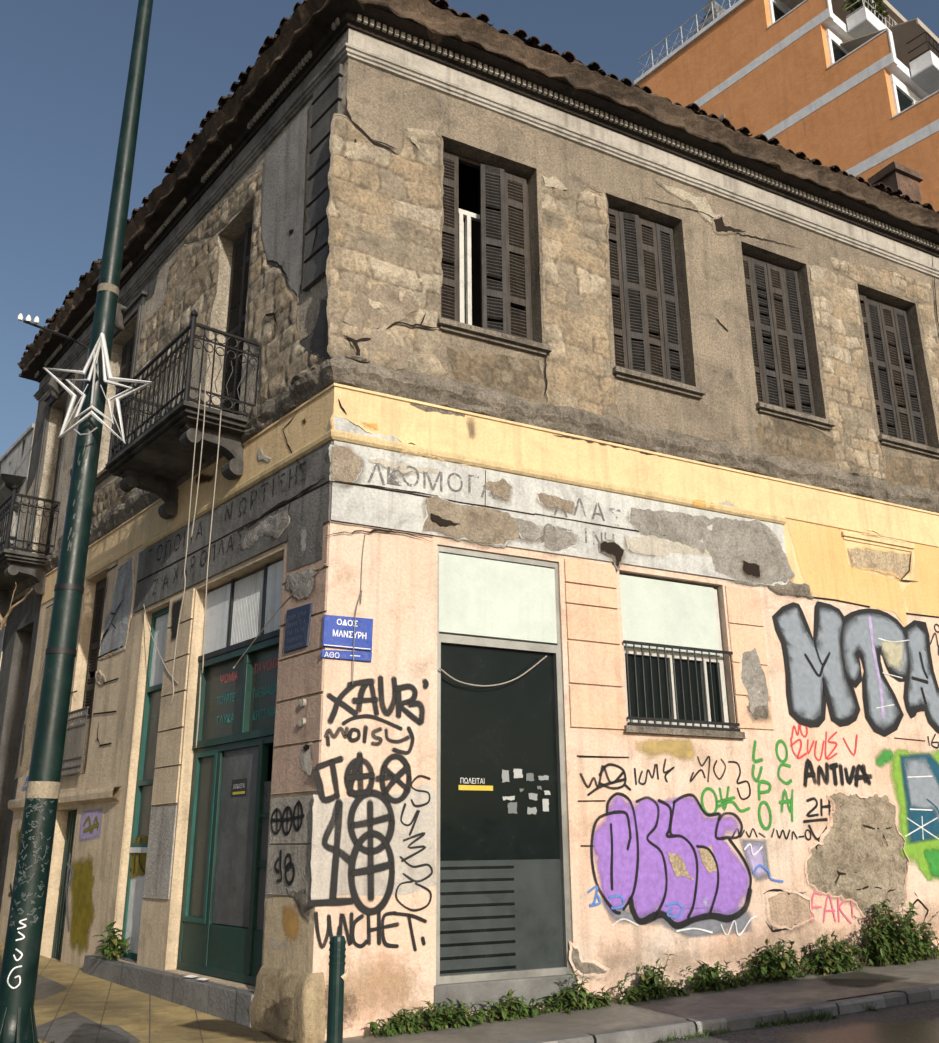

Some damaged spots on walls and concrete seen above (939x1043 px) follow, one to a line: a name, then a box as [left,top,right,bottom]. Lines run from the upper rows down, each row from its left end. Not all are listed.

crack [345,99,397,158]
crack [644,197,714,218]
crack [736,230,800,249]
crack [268,260,289,280]
crack [247,410,438,527]
spalling [328,444,362,483]
peeling [330,414,482,468]
spalling [421,478,579,551]
spalling [624,500,813,599]
peeling [95,555,135,686]
spalling [739,648,770,720]
spalling [765,889,815,930]